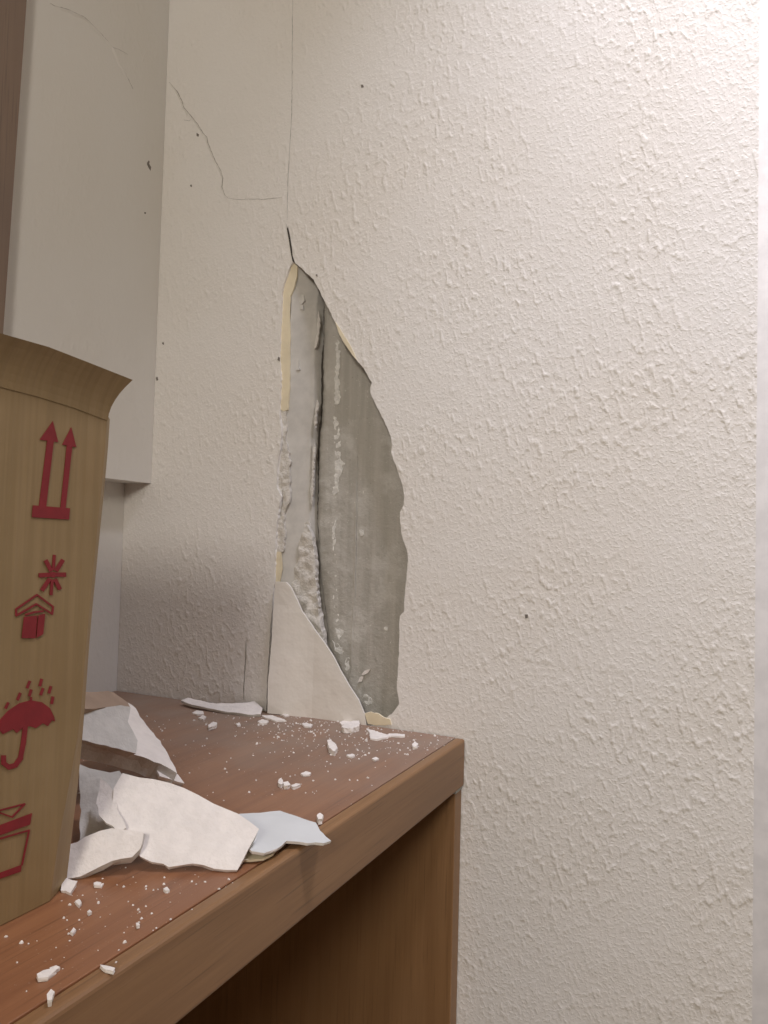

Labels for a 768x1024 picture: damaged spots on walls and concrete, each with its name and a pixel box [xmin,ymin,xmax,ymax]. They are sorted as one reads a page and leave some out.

crack [168,7,295,263]
spalling [276,263,418,758]